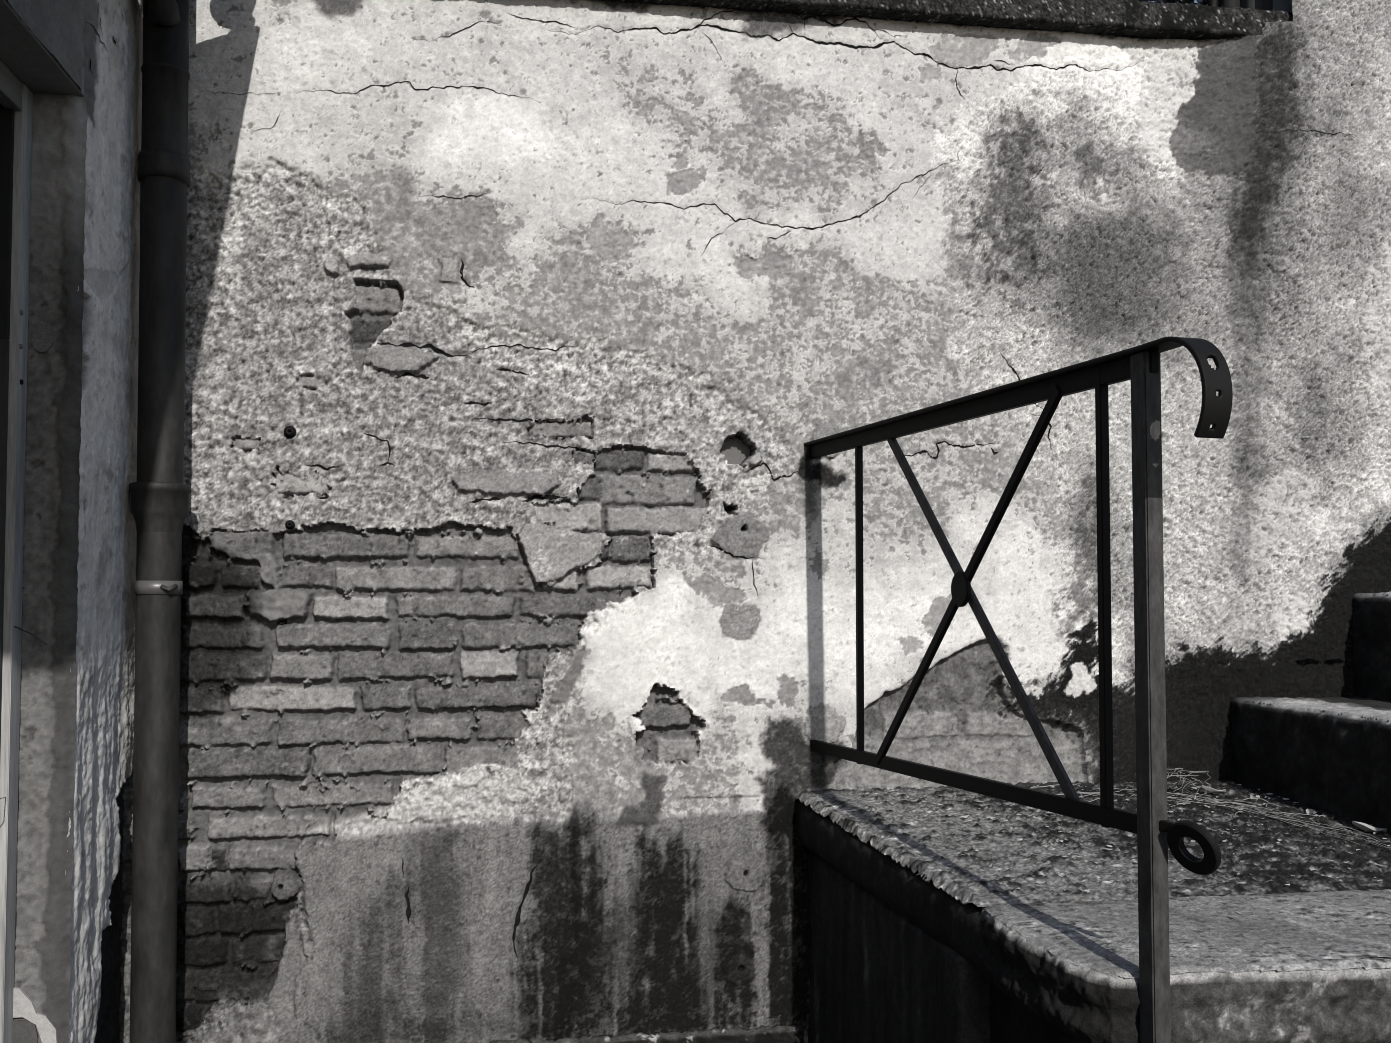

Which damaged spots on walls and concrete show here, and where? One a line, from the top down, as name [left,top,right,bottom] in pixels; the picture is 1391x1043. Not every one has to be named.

crack [412,9,1144,100]
crack [417,191,494,199]
crack [586,139,971,258]
spalling [345,277,404,371]
peeling [683,572,748,607]
spalling [176,414,738,1031]
damp [328,875,400,1042]
damp [409,834,460,1043]
damp [511,716,840,1043]